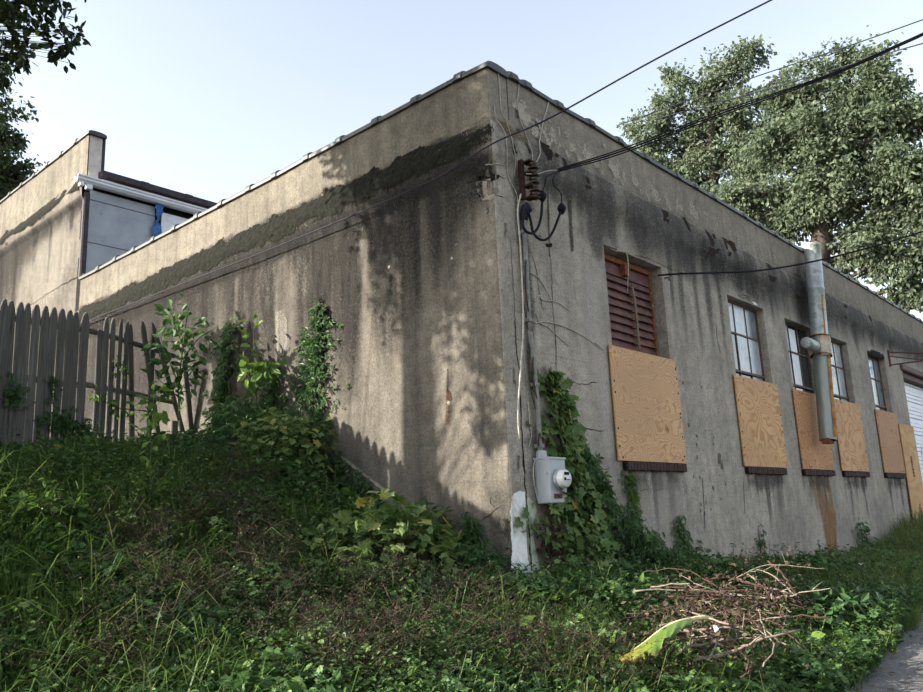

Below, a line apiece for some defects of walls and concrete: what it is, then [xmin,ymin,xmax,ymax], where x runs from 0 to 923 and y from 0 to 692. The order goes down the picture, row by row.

water stain [77,128,495,429]
peeling [508,96,804,282]
water stain [532,144,808,321]
water stain [825,293,923,359]
corrosion [812,477,838,553]